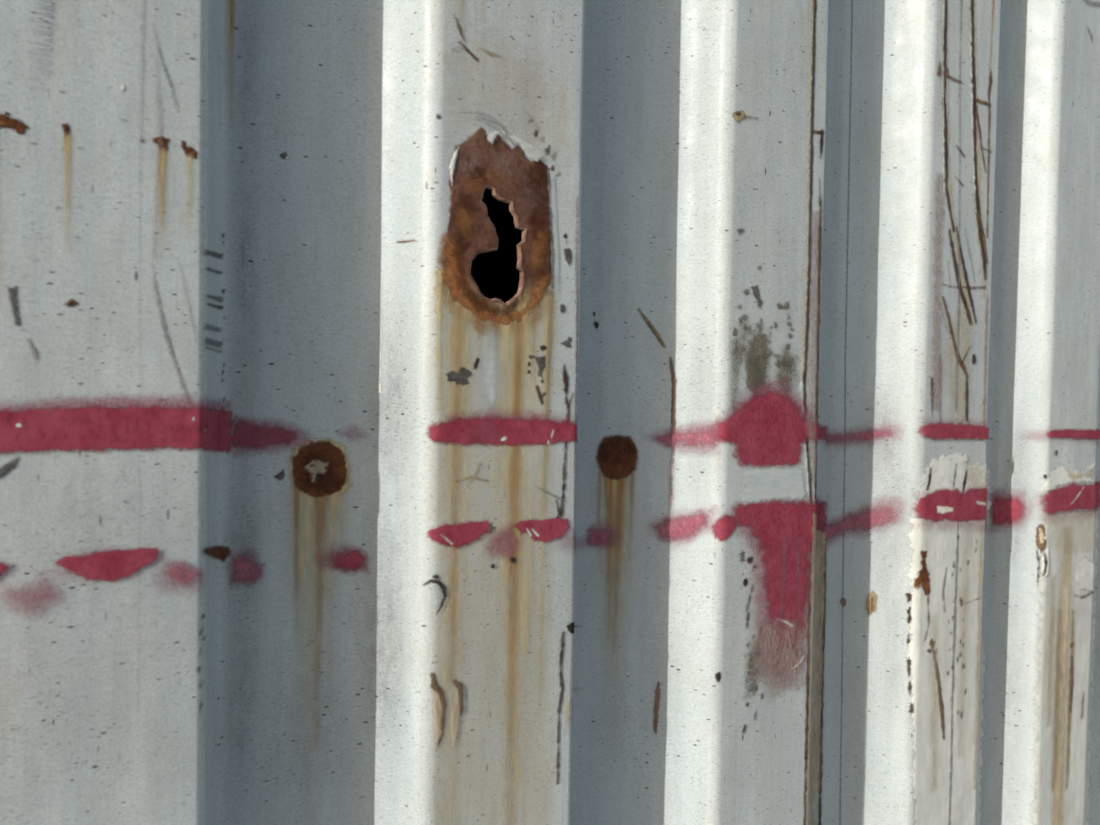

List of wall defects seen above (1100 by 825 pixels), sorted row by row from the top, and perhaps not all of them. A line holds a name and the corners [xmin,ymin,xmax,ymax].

rust [0,112,29,134]
rust [62,124,70,160]
rust [141,136,197,181]
rust [290,439,350,568]
rust [597,436,638,561]
peeling [905,452,992,825]
peeling [1032,450,1100,825]